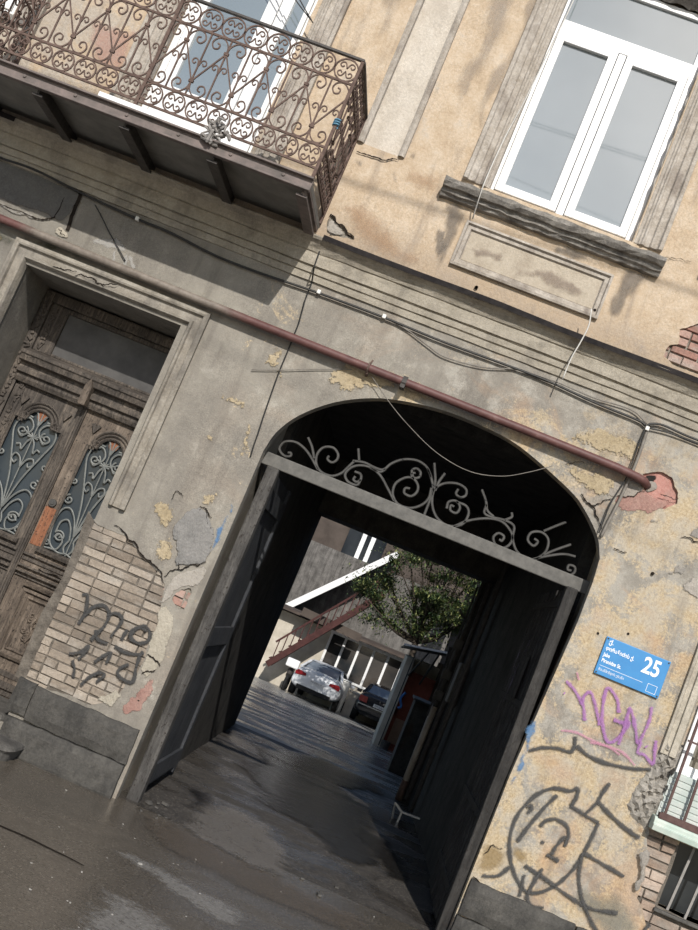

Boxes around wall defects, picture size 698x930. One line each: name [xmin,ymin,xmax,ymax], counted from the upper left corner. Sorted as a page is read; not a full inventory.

spalling [664,325,698,374]
spalling [570,467,679,522]
spalling [15,501,207,715]